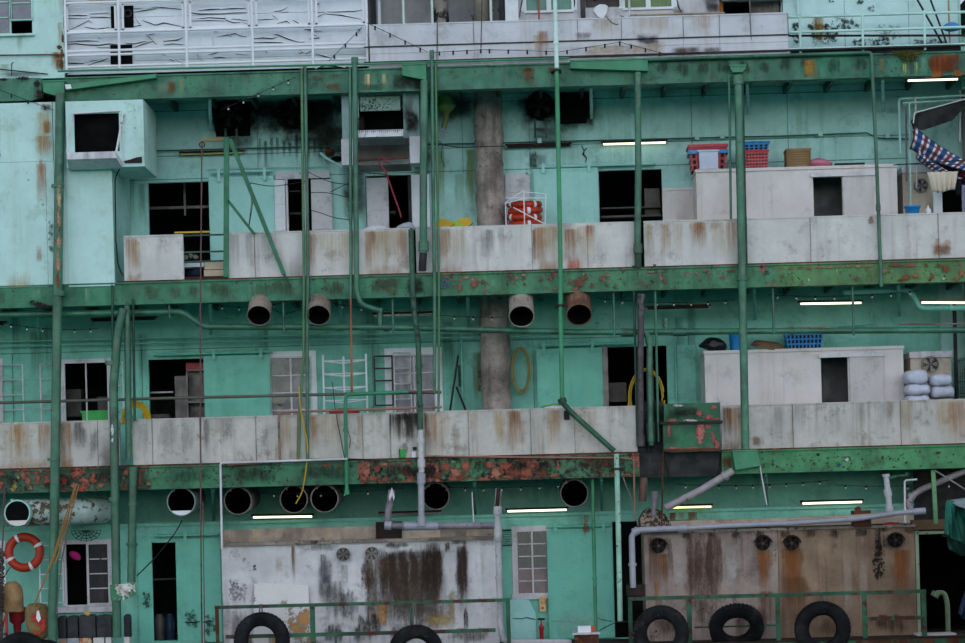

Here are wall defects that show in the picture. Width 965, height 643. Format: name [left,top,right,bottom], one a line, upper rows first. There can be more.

damp [792,17,893,46]
corrosion [929,54,962,77]
corrosion [39,122,51,151]
corrosion [533,228,543,250]
corrosion [117,246,965,293]
peeling [667,405,720,449]
corrosion [0,461,220,470]
corrosion [721,443,965,467]
corrosion [687,536,722,604]
corrosion [758,551,771,578]
damp [320,540,467,641]
damp [458,610,487,640]